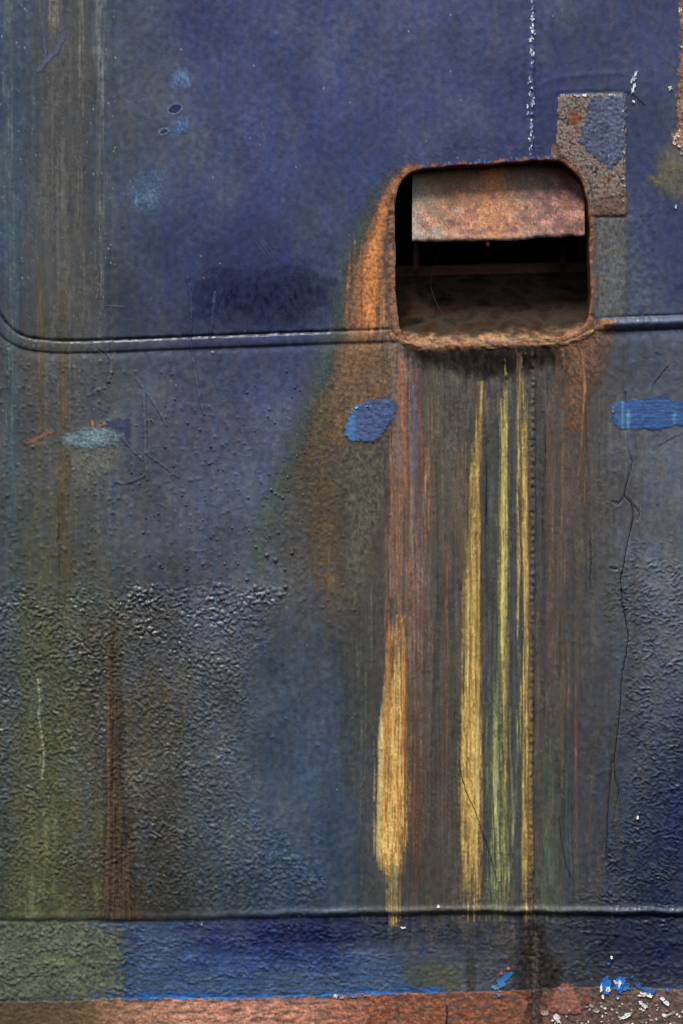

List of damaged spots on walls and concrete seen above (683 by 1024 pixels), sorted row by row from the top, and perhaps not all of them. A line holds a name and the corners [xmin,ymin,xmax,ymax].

peeling [527,0,536,155]
rust [254,187,433,785]
crack [606,431,640,857]
peeling [541,956,683,1024]